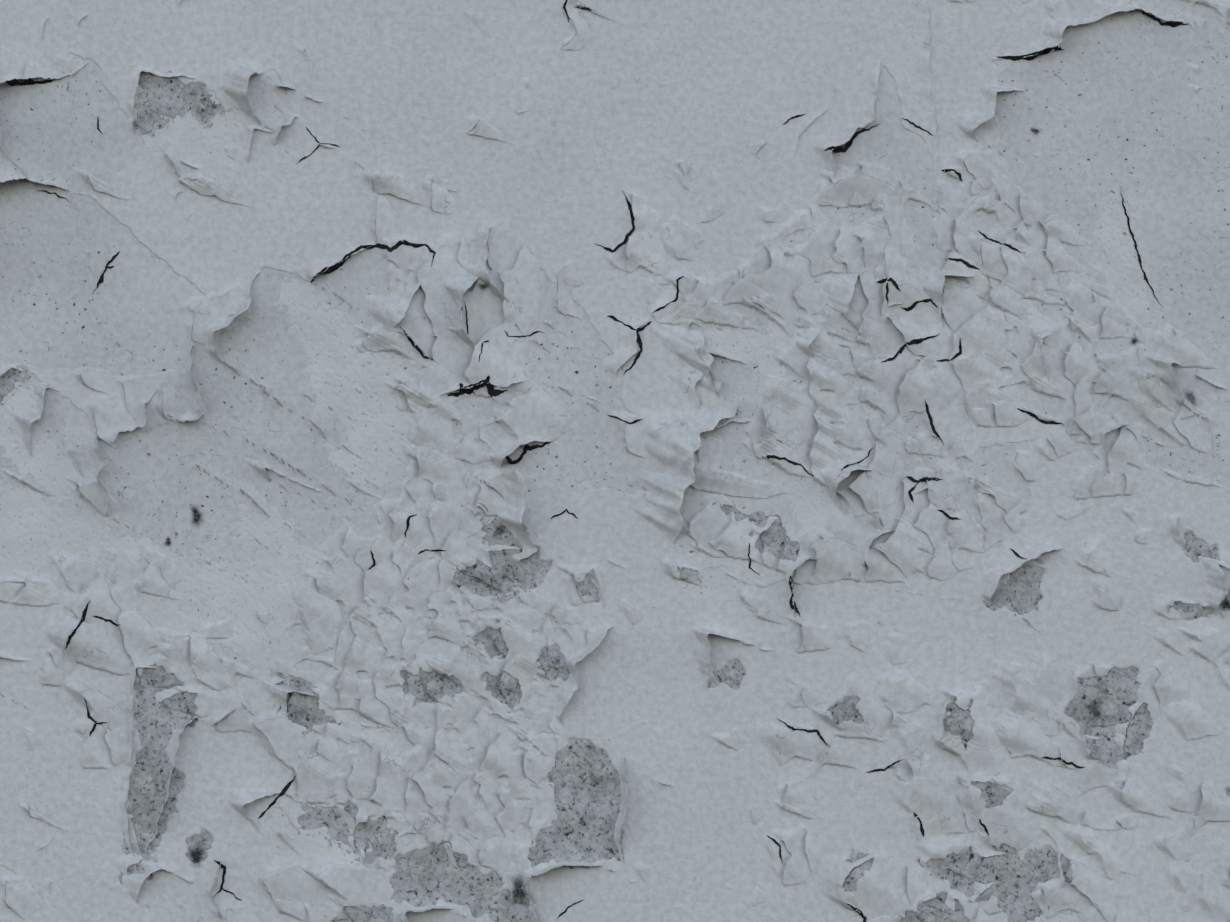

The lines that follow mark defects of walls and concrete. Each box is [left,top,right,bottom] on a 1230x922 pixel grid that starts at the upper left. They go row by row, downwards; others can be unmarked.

crack [1120,192,1161,305]
peeling [754,515,1230,922]